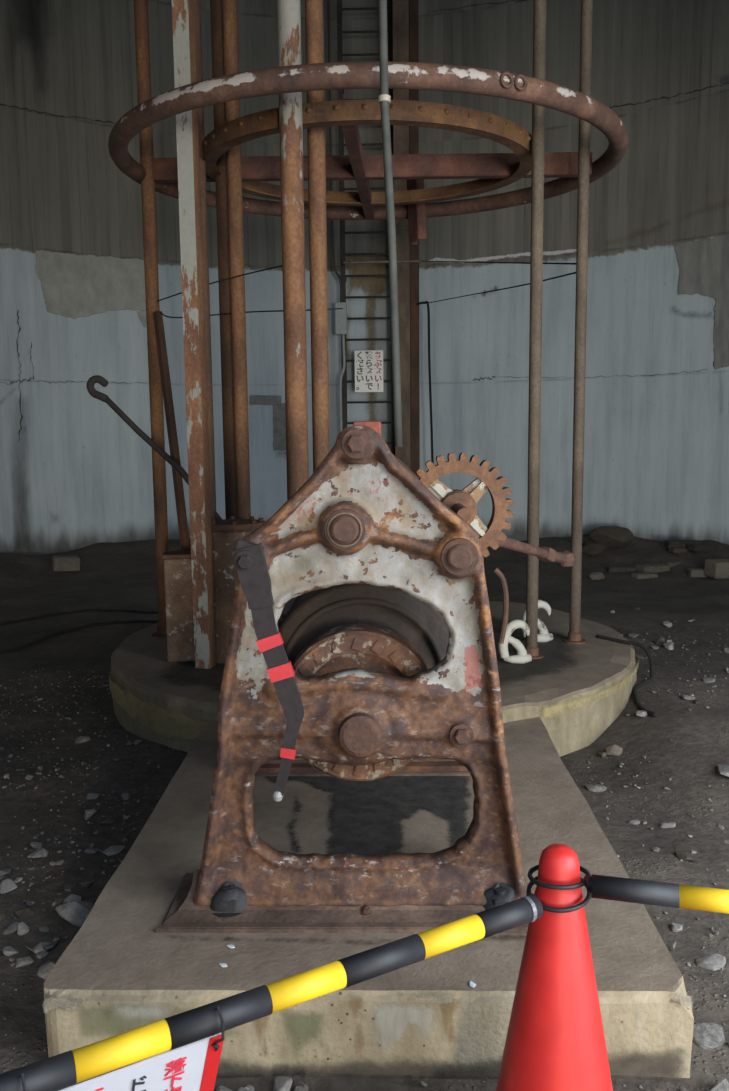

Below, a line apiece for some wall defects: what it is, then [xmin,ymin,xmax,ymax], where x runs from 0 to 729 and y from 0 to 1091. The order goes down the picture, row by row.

peeling [35,250,147,327]
peeling [674,234,729,370]
crack [0,309,85,442]